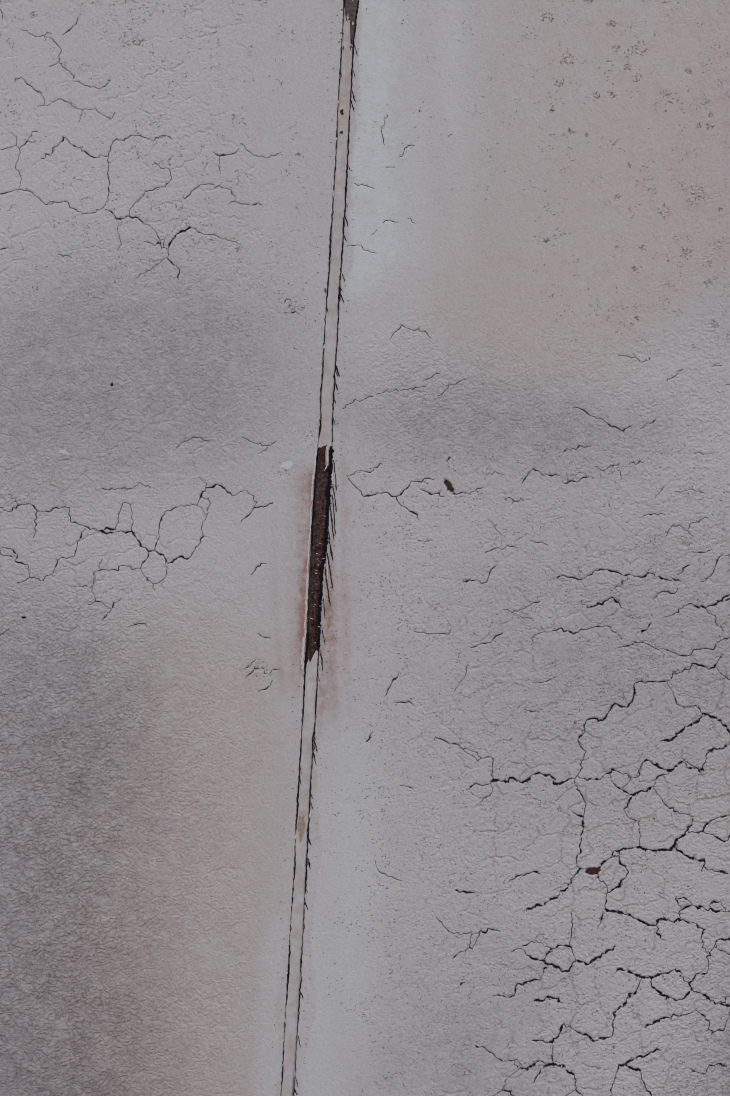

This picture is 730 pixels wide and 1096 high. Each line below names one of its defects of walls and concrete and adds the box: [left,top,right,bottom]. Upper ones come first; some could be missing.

crack [1,12,281,280]
crack [0,477,273,627]
rust [269,454,315,704]
rust [317,432,376,749]
crack [346,445,643,584]
crack [573,407,655,432]